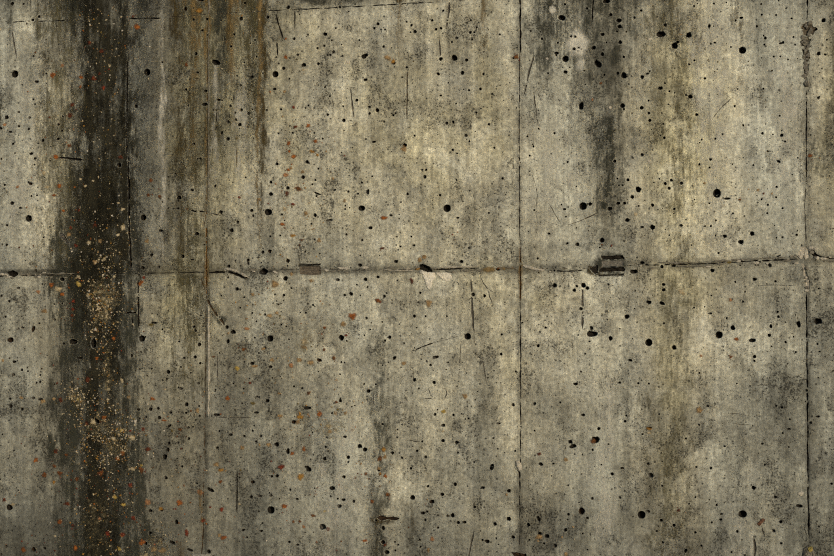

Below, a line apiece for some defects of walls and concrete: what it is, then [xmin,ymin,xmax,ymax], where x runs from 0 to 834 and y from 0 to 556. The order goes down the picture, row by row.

corrosion [158,0,271,216]
damp [536,0,637,71]
damp [586,98,628,212]
damp [36,0,166,556]
corrosion [171,201,212,355]